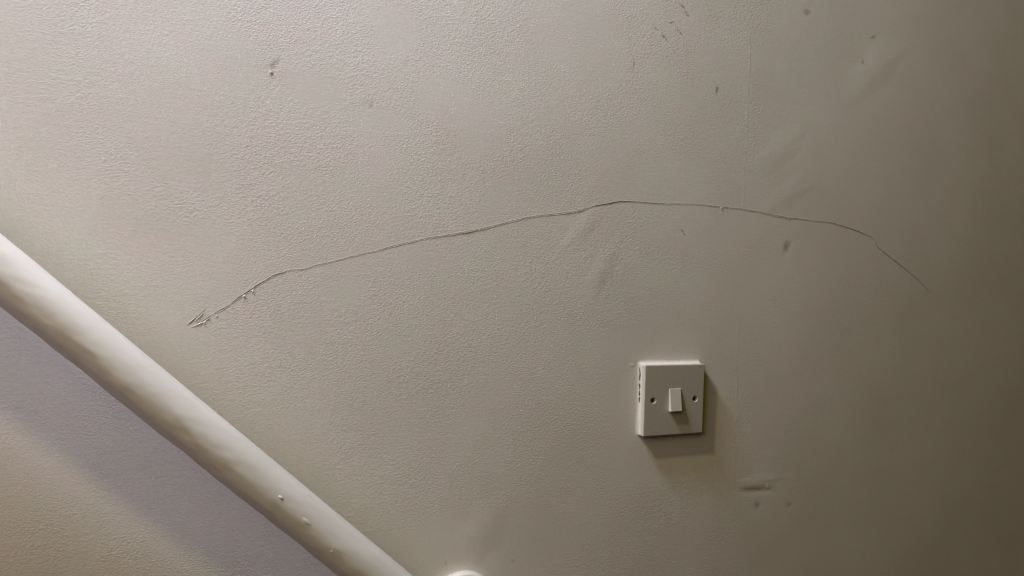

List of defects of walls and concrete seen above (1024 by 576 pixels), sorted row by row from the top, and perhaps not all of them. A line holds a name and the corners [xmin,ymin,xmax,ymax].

crack [188,200,931,327]